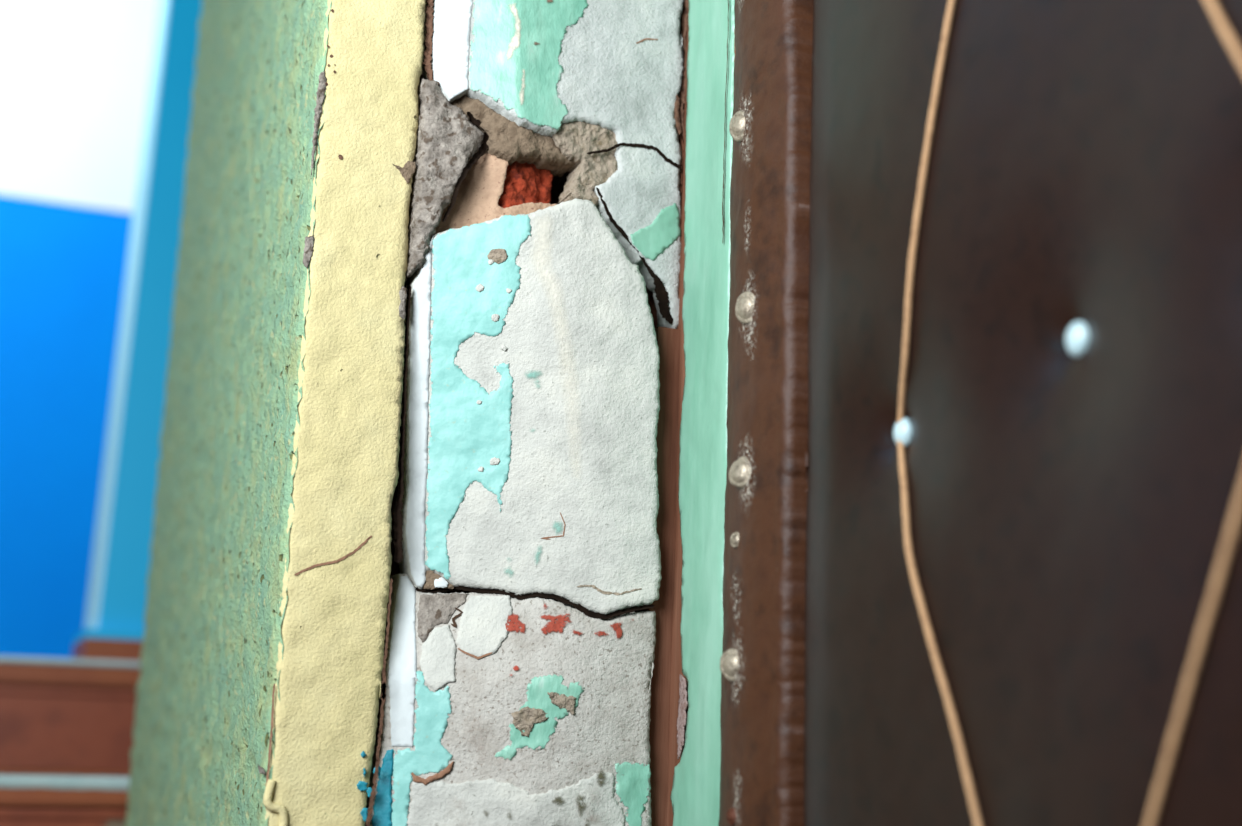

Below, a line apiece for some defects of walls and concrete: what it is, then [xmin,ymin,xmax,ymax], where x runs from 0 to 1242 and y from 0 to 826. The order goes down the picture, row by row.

crack [422,0,440,86]
crack [587,0,688,222]
crack [596,187,673,324]
peeling [630,203,681,261]
peeling [388,0,651,826]
crack [294,286,654,826]